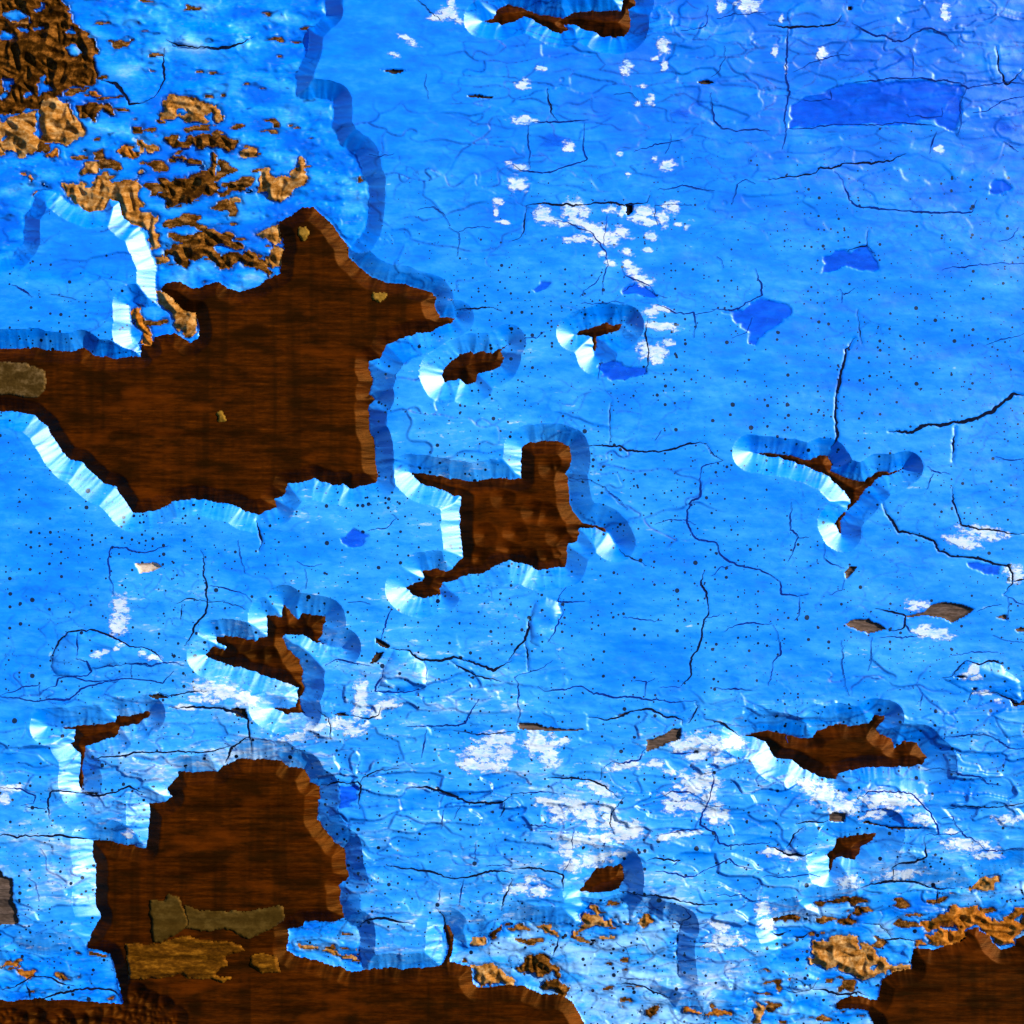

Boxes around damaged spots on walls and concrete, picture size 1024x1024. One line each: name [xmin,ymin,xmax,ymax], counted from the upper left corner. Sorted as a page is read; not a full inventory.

peeling [0,0,114,158]
damp [533,197,689,287]
peeling [0,94,635,618]
crack [890,392,1024,534]
crack [0,522,263,763]
crack [319,408,845,754]
peeling [0,585,584,1024]
damp [455,729,569,774]
crack [387,748,647,939]
damp [534,731,753,873]
damp [796,779,934,826]
peeling [806,808,1024,1024]